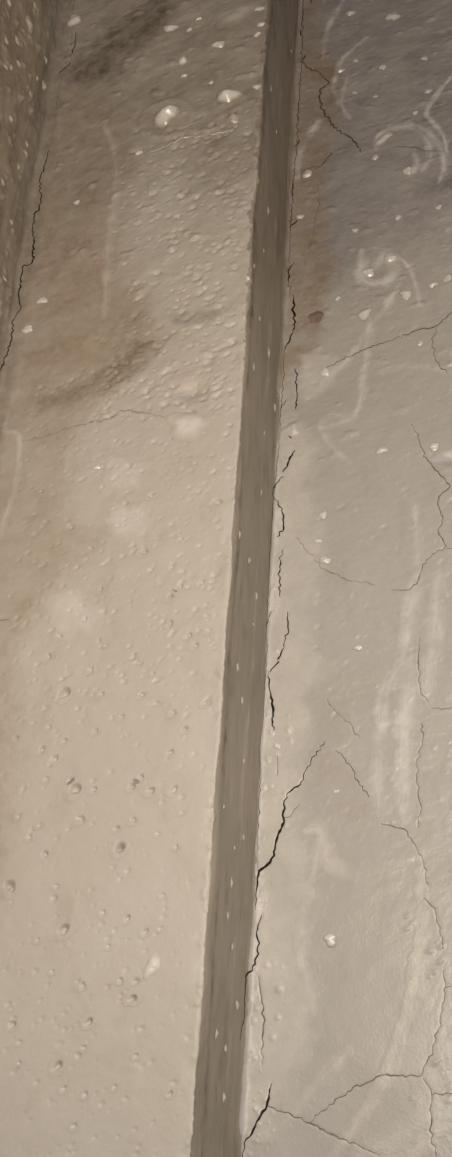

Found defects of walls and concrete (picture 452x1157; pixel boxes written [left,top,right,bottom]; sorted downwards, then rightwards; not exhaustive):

crack [0,150,50,371]
crack [25,409,165,441]
crack [240,0,452,1157]